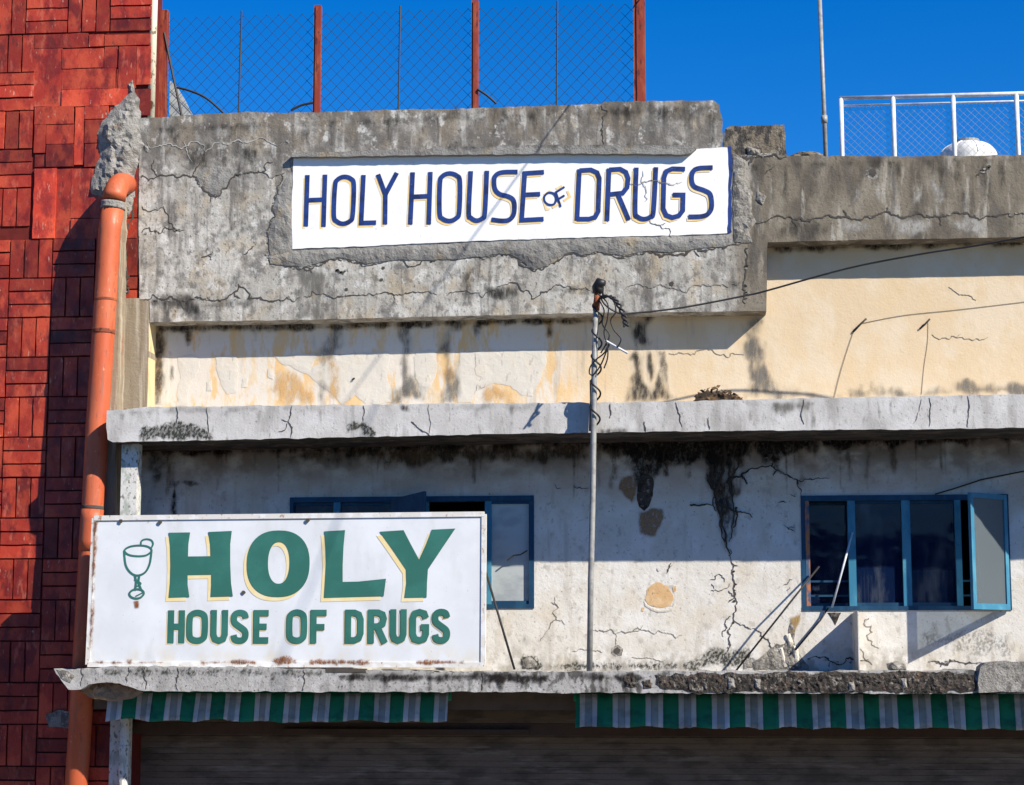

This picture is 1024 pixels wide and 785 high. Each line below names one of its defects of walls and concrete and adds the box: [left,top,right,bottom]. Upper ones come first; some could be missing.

crack [126,137,1024,309]
peeling [160,354,200,406]
leakage [155,272,325,390]
peeling [268,352,392,404]
leakage [323,321,432,410]
leakage [628,317,669,400]
leakage [262,421,975,524]
spalling [619,467,663,536]
crack [766,457,829,532]
crack [572,627,680,662]
crack [710,549,772,658]
spalling [624,623,978,695]